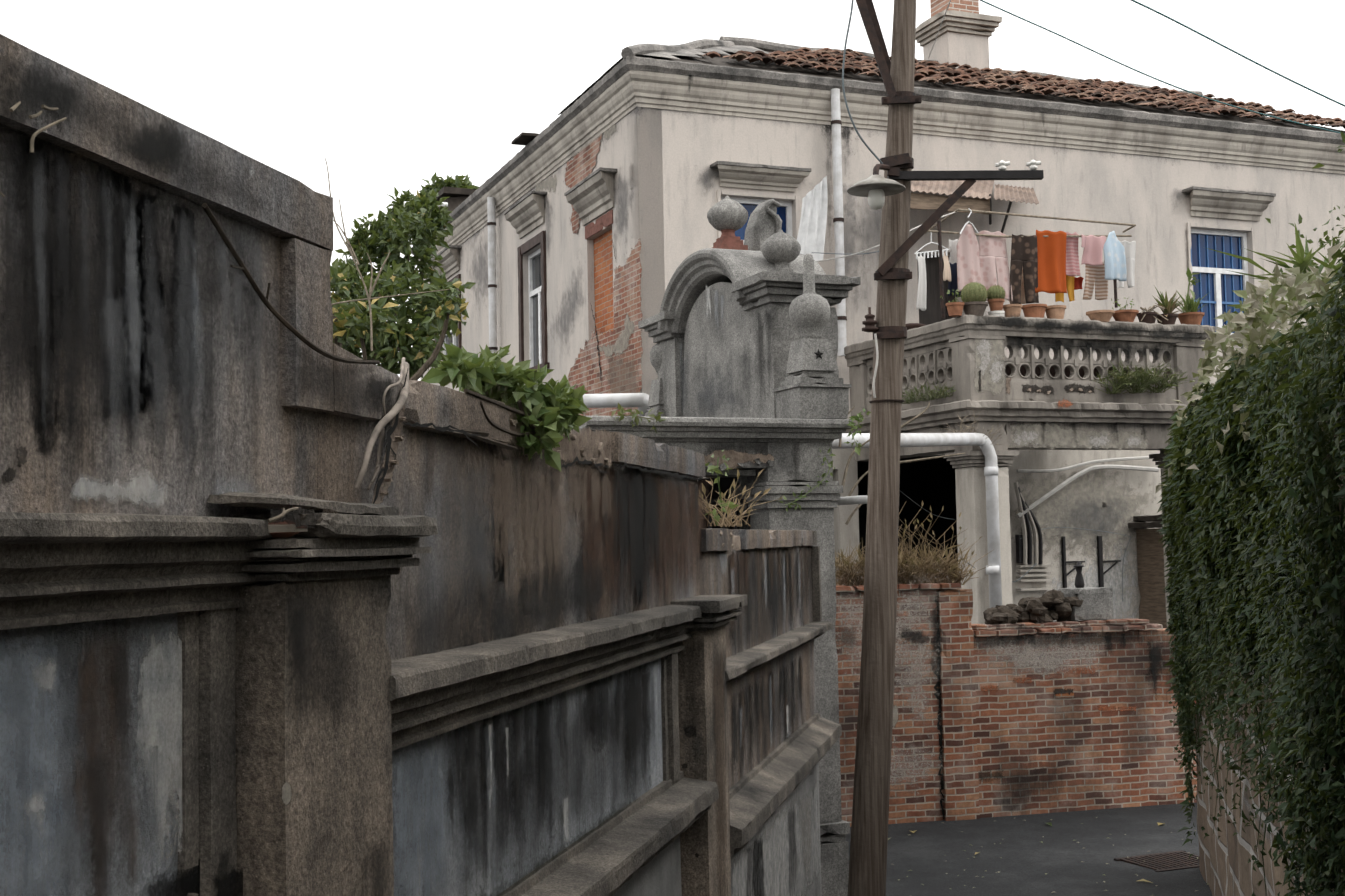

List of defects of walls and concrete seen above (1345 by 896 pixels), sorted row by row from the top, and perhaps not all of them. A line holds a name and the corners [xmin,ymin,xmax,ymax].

spalling [563,124,616,234]
water stain [7,182,219,443]
spalling [488,239,643,479]
water stain [418,470,659,655]
water stain [730,546,810,643]
water stain [448,667,651,870]
water stain [213,853,243,896]